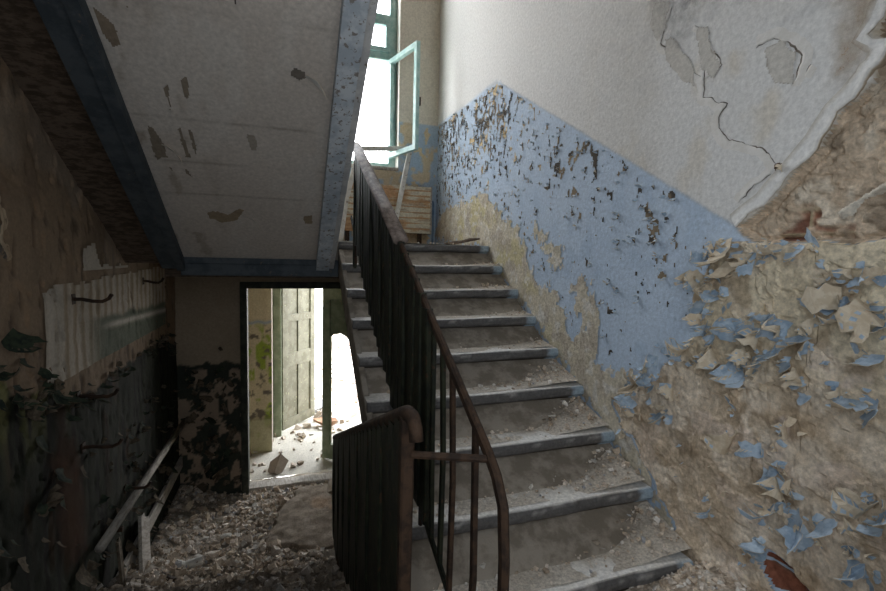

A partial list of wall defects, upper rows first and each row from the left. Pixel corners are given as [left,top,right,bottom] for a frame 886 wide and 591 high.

peeling [93,7,121,47]
peeling [291,68,327,99]
crack [756,27,817,87]
crack [691,25,776,203]
peeling [148,126,197,177]
peeling [83,243,128,271]
peeling [406,0,886,591]
peeling [0,323,178,422]
peeling [75,532,139,591]